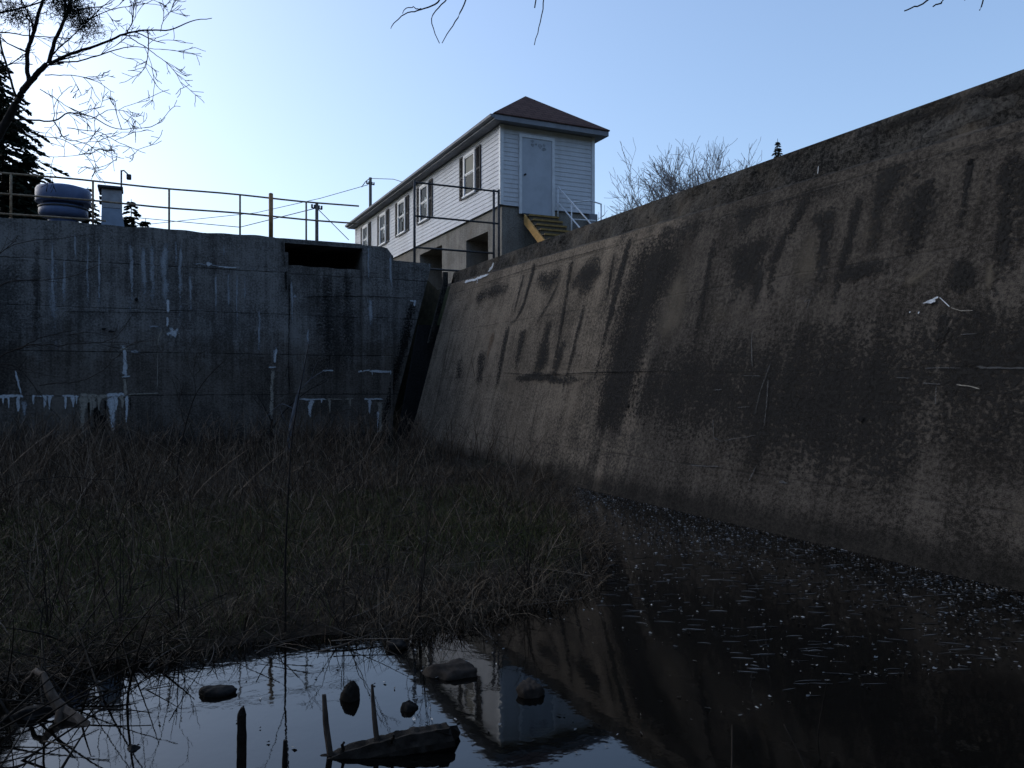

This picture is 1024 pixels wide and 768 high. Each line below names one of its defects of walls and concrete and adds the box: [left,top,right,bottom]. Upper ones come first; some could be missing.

damp [871,76,1024,137]
efflorescence [0,235,246,438]
damp [299,300,416,442]
damp [465,132,1024,496]